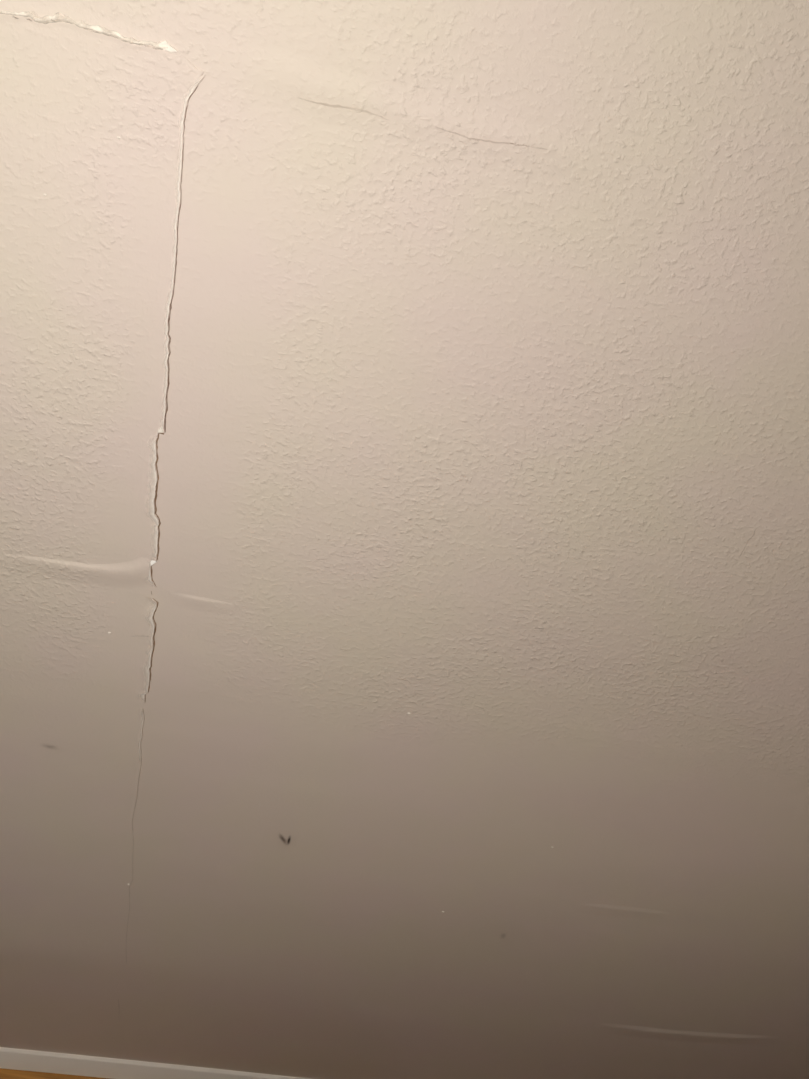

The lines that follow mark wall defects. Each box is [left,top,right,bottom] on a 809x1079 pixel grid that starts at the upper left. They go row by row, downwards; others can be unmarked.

flaking render [0,0,177,54]